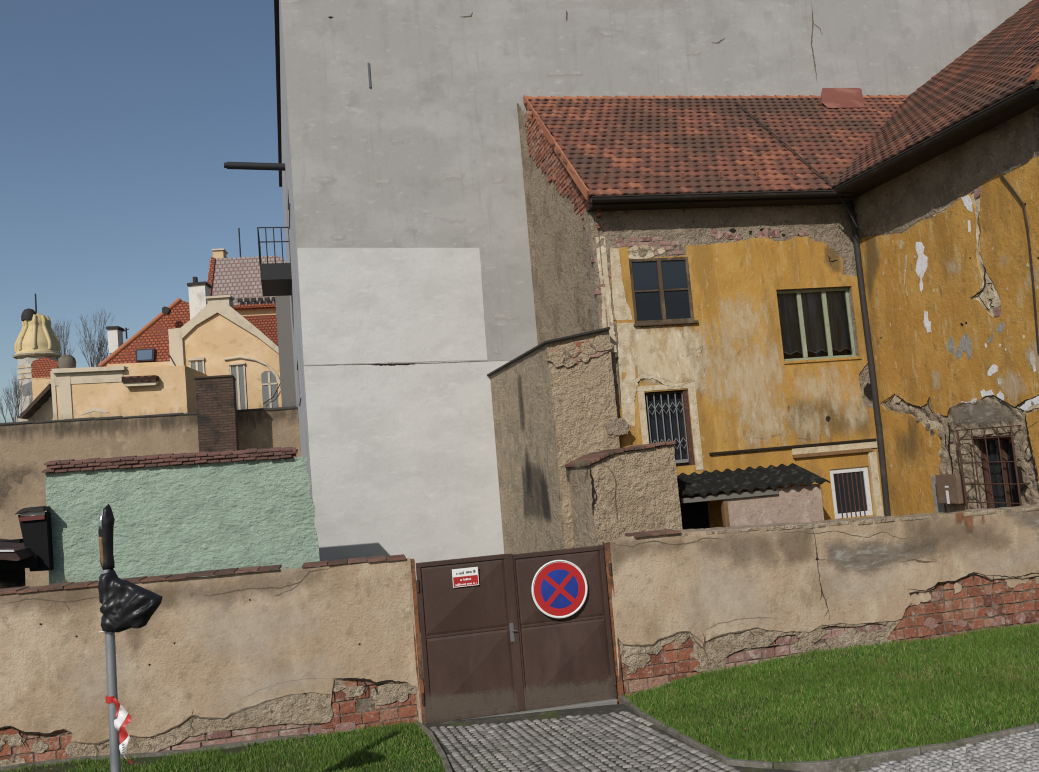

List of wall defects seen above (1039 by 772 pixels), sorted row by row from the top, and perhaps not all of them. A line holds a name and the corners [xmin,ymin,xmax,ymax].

crack [811,10,822,80]
flaking render [524,109,1039,441]
flaking render [880,364,1039,513]
flaking render [611,573,1039,703]
crack [786,528,1039,618]
flaking render [0,679,427,767]